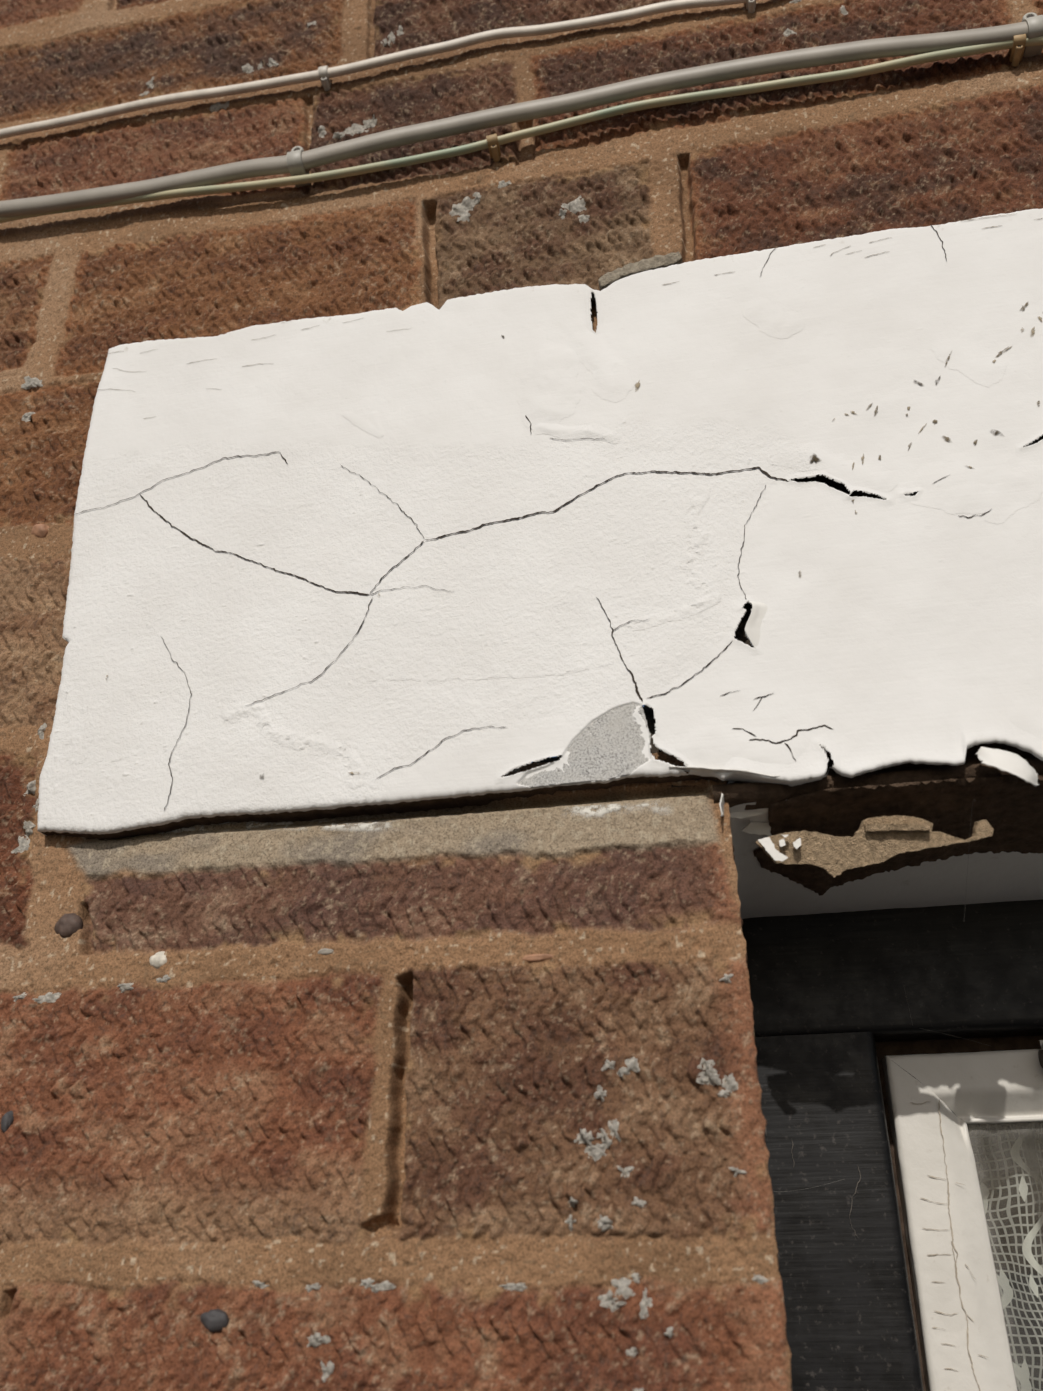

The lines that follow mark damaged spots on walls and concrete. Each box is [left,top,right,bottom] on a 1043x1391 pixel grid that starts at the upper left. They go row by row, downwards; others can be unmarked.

crack [74,452,865,706]
crack [162,638,192,810]
crack [376,726,501,779]
crack [532,755,562,763]
peeling [518,703,651,787]
crack [596,597,832,761]
spalling [669,747,1043,896]